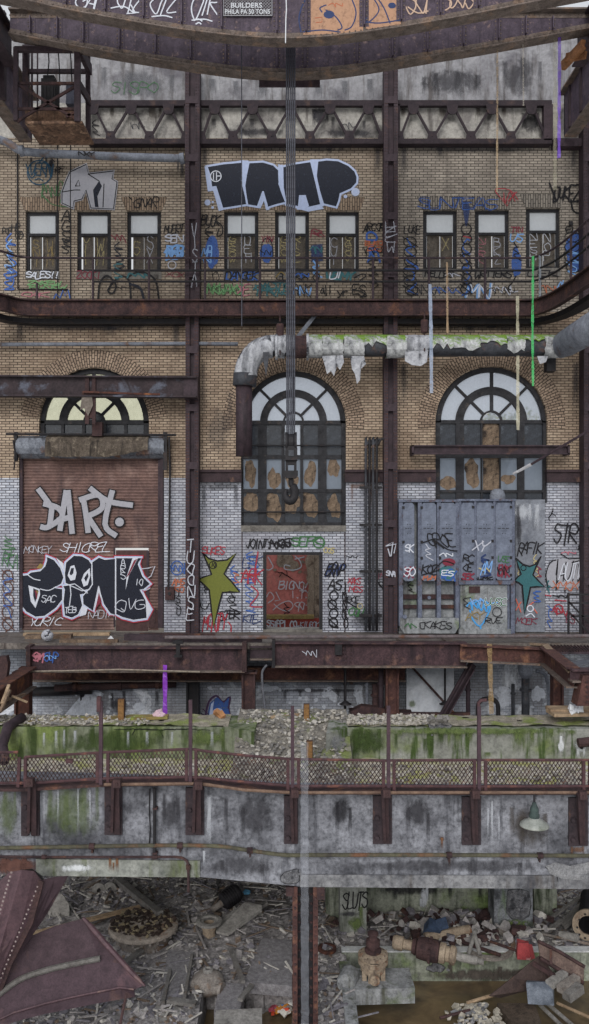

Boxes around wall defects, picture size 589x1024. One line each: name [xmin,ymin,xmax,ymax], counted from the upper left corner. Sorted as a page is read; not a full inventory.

damp [432,73,476,90]
damp [549,729,586,755]